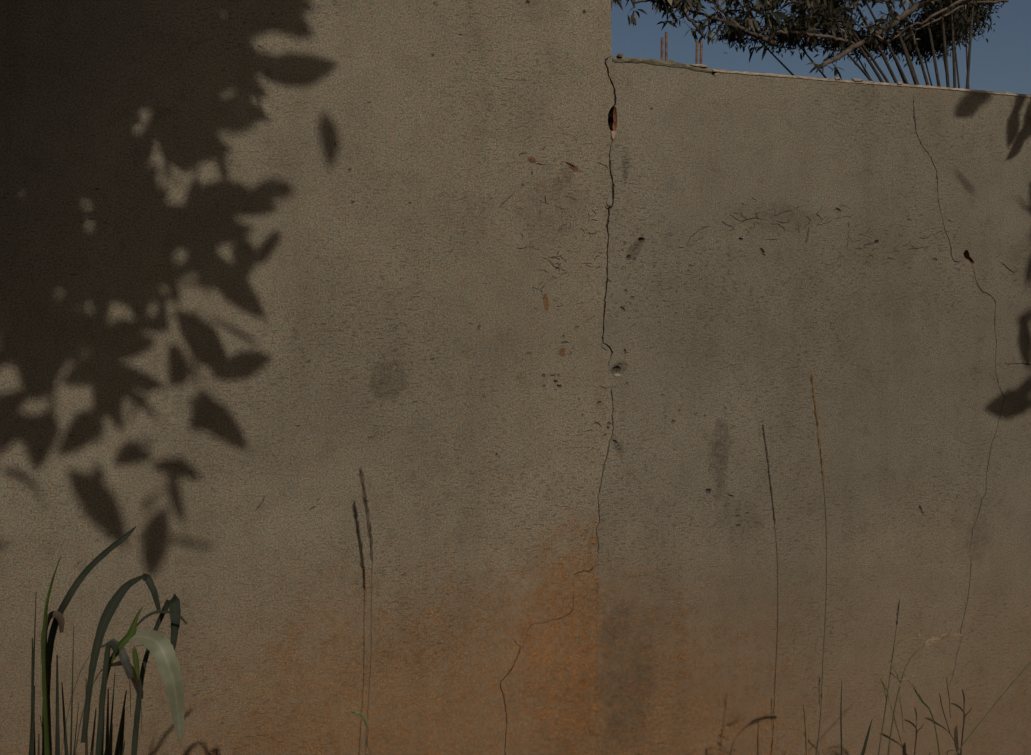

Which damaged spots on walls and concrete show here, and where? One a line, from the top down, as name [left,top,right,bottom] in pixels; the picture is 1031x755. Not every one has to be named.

crack [500,142,616,755]
crack [605,57,616,108]
spalling [608,105,617,141]
crack [680,97,1031,686]